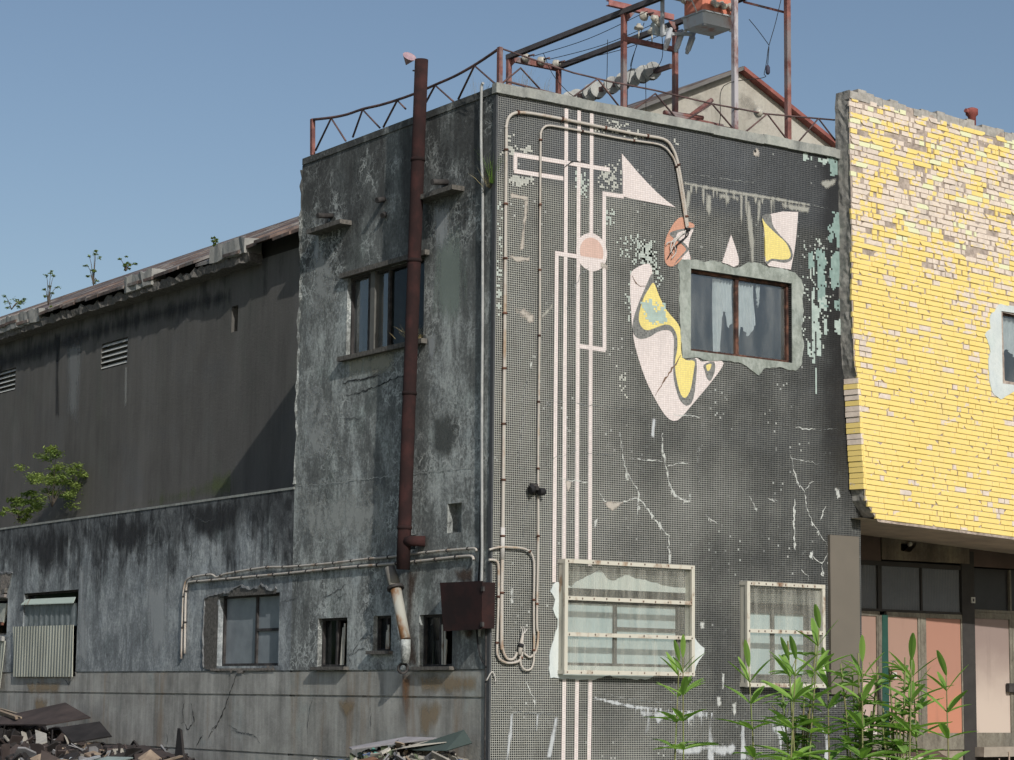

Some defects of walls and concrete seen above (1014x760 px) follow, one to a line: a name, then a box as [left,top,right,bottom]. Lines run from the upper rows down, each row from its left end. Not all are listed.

peeling [803,153,838,176]
peeling [802,211,841,394]
leakage [0,303,192,413]
crack [510,268,715,555]
leakage [24,534,68,572]
leakage [192,506,236,535]
crack [749,452,828,580]